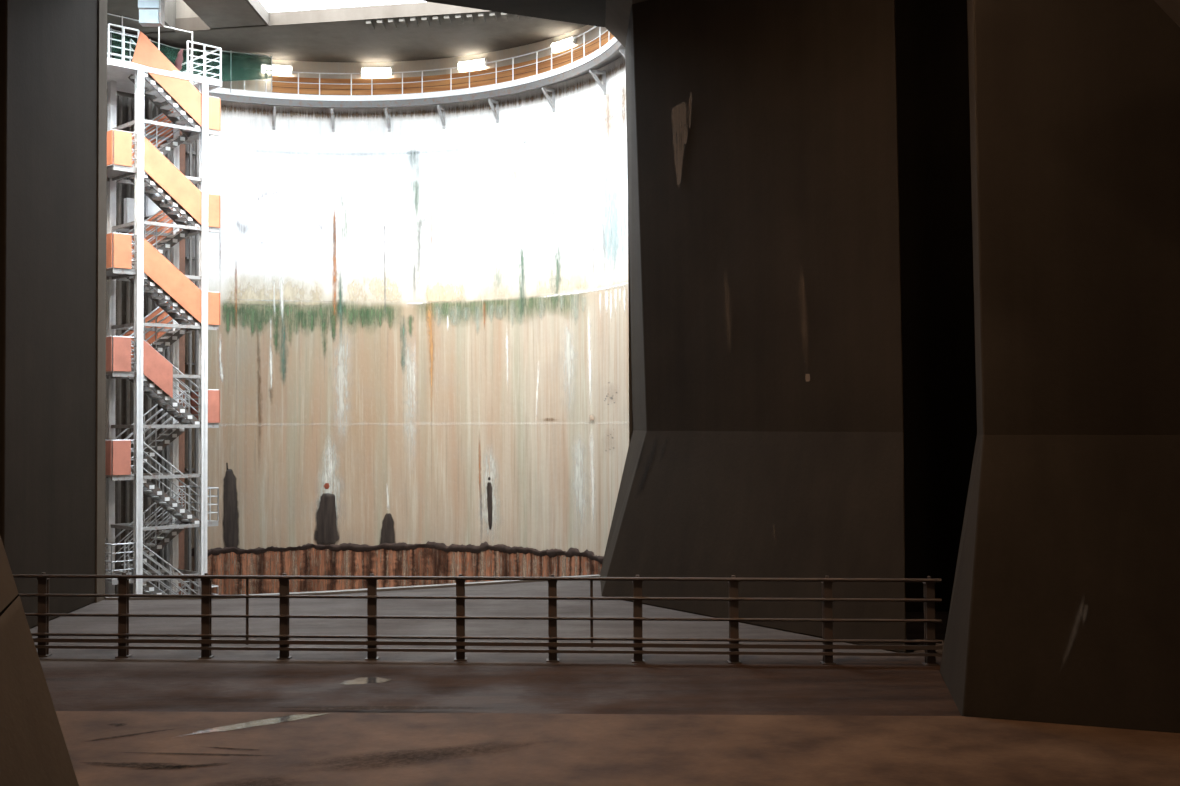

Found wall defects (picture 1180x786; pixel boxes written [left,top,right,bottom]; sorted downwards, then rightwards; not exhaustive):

leakage [230,279,320,333]
leakage [339,279,463,327]
leakage [545,283,625,314]
leakage [337,346,348,424]
leakage [223,463,239,547]
leakage [314,446,339,545]
leakage [380,491,395,548]
leakage [482,456,495,529]